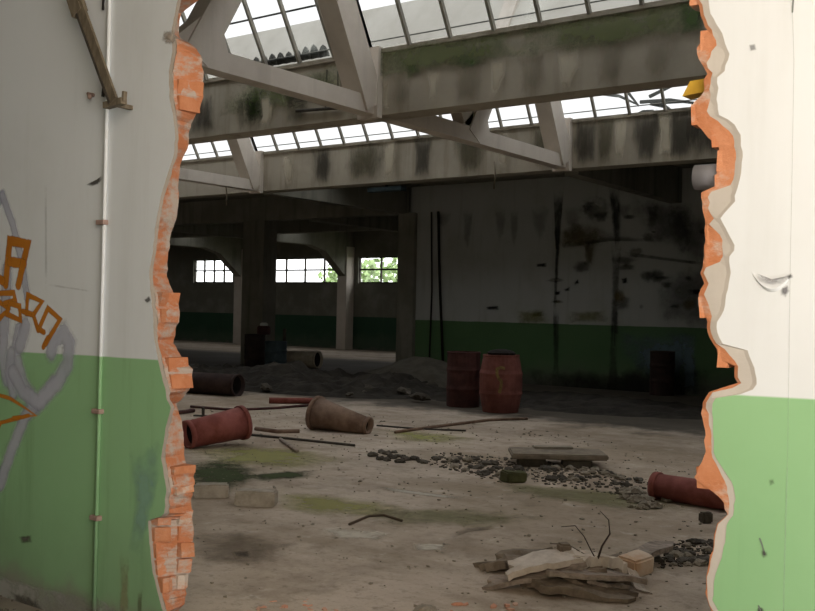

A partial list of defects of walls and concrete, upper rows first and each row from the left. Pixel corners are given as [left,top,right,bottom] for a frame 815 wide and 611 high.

damp [240,100,271,123]
damp [317,150,328,179]
damp [416,140,430,173]
damp [457,142,479,167]
damp [534,132,544,148]
damp [611,193,620,239]
damp [554,202,562,294]
spalling [145,0,204,611]
spalling [689,0,757,611]